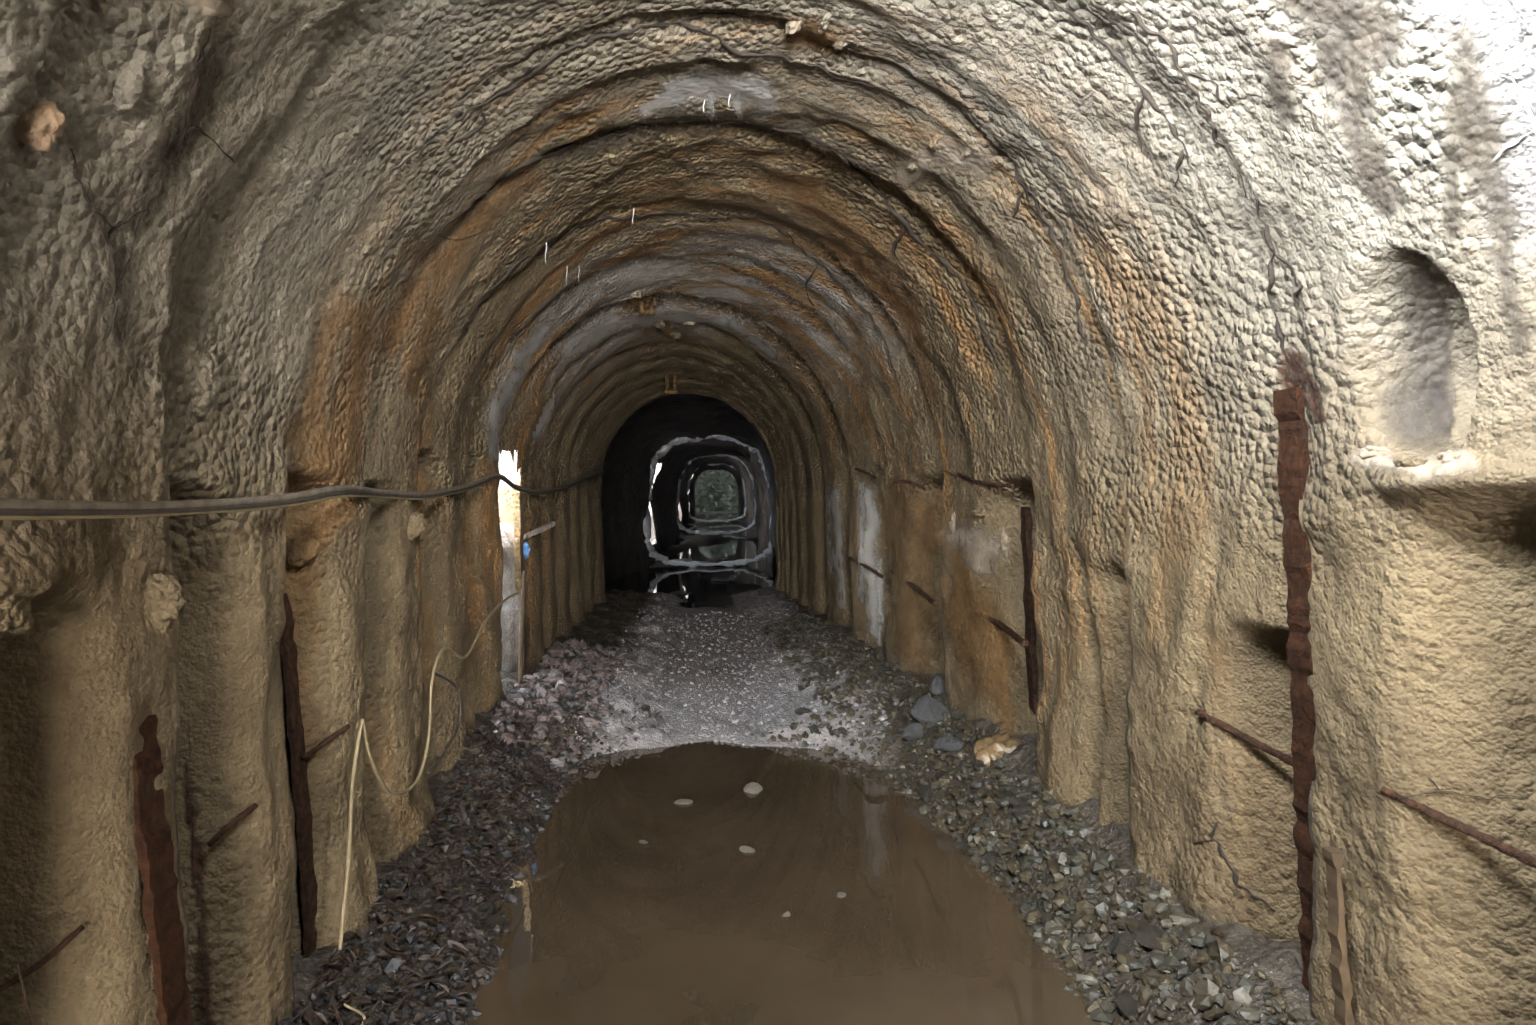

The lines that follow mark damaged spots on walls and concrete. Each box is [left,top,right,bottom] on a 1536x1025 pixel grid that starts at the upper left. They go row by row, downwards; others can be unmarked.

rust [185,762,216,1025]